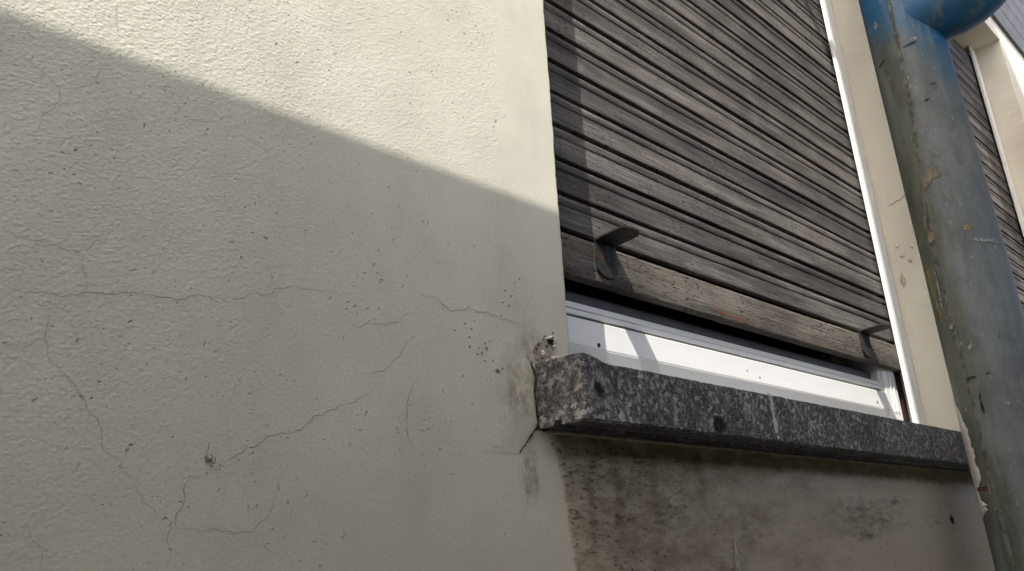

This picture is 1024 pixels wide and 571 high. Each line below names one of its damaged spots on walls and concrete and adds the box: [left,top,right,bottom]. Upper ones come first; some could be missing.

crack [4,217,550,568]
flaking render [533,332,559,363]
peeling [953,397,988,521]